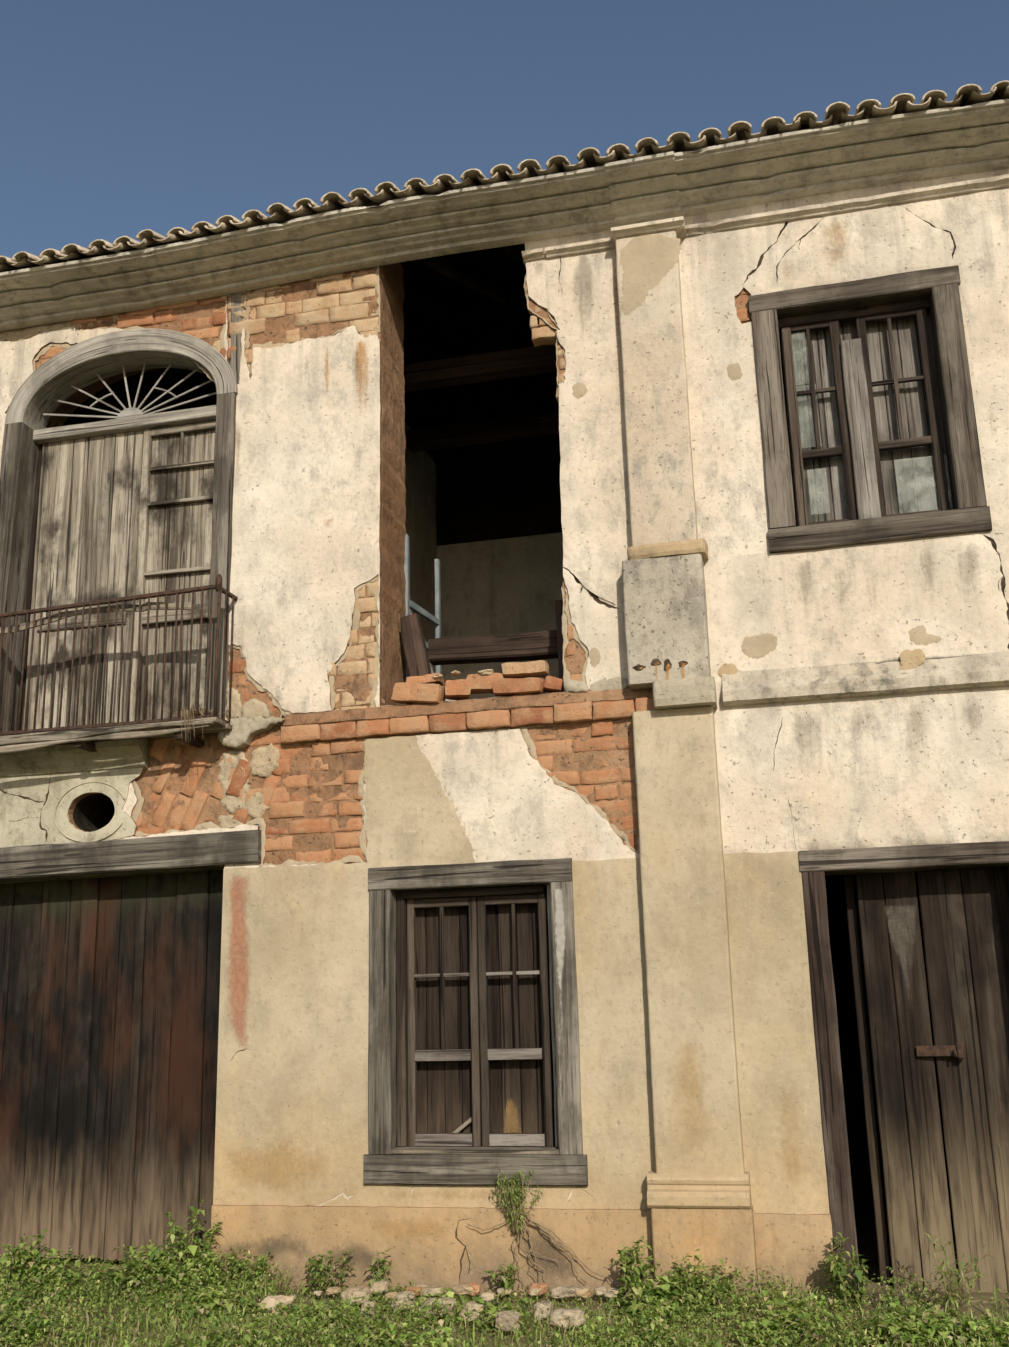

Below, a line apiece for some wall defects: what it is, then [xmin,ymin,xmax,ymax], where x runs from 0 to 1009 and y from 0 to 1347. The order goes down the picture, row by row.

crack [743,222,818,285]
flaking render [0,266,384,377]
flaking render [734,289,752,324]
crack [563,567,619,610]
crack [984,535,1009,649]
spalling [632,659,688,680]
flaking render [131,575,655,867]
crack [0,779,51,841]